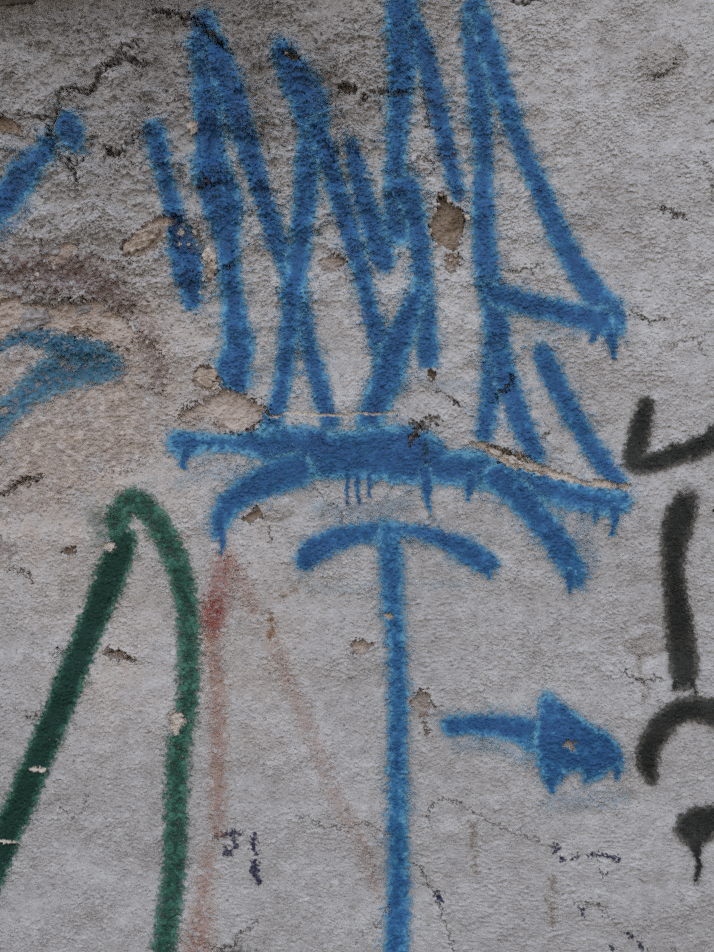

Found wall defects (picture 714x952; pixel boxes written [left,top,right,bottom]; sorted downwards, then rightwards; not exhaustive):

spalling [428,193,470,274]
spalling [350,637,374,655]
peeling [409,688,436,735]